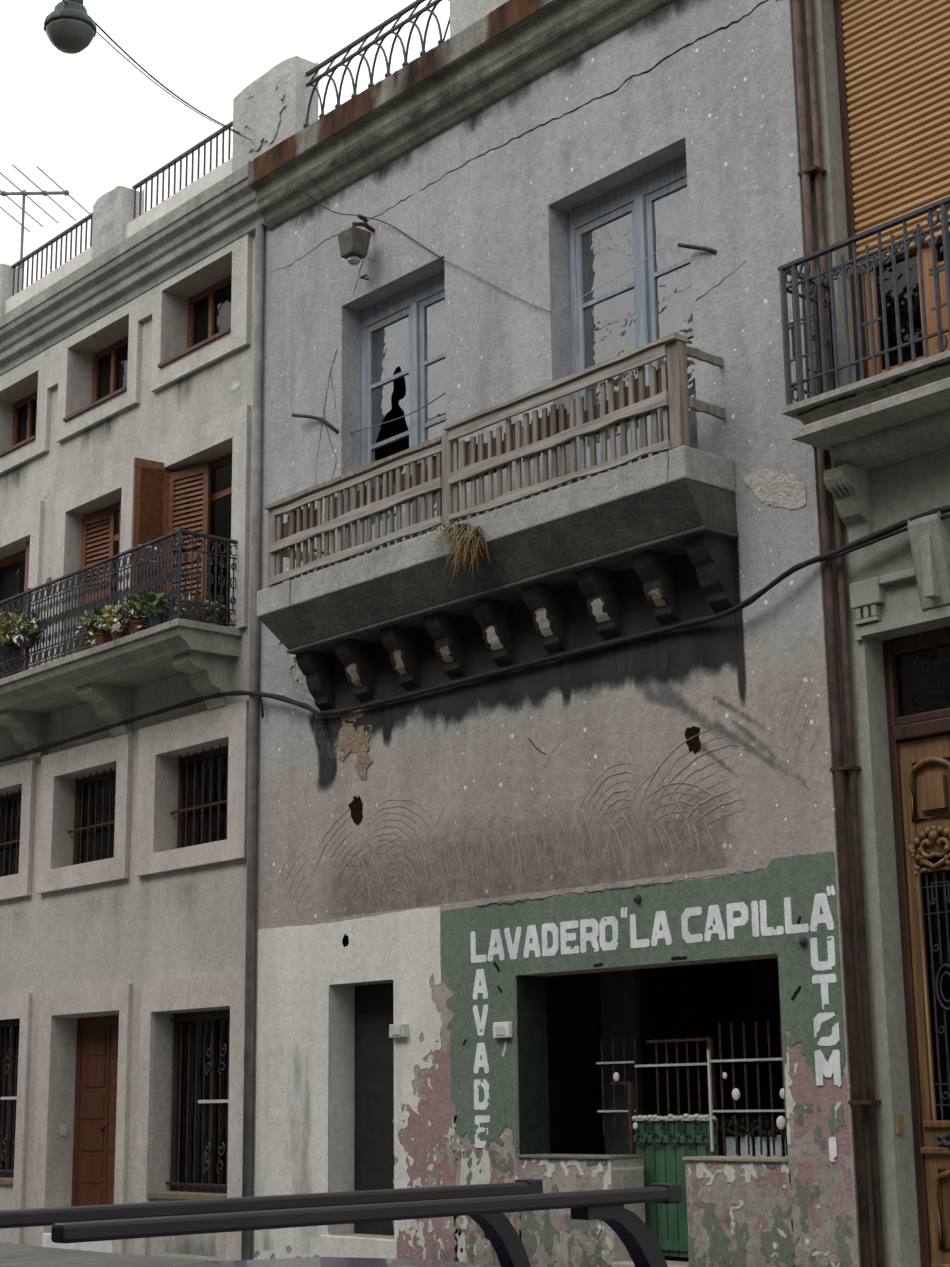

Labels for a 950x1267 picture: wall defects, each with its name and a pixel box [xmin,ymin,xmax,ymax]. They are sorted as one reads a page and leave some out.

rust [487,0,540,40]
rust [319,39,448,142]
crack [368,0,783,220]
rust [254,134,296,182]
spalling [335,709,373,780]
peeling [392,1036,613,1193]
peeling [685,1031,857,1267]
peeling [393,1215,500,1266]
peeling [503,1208,614,1267]